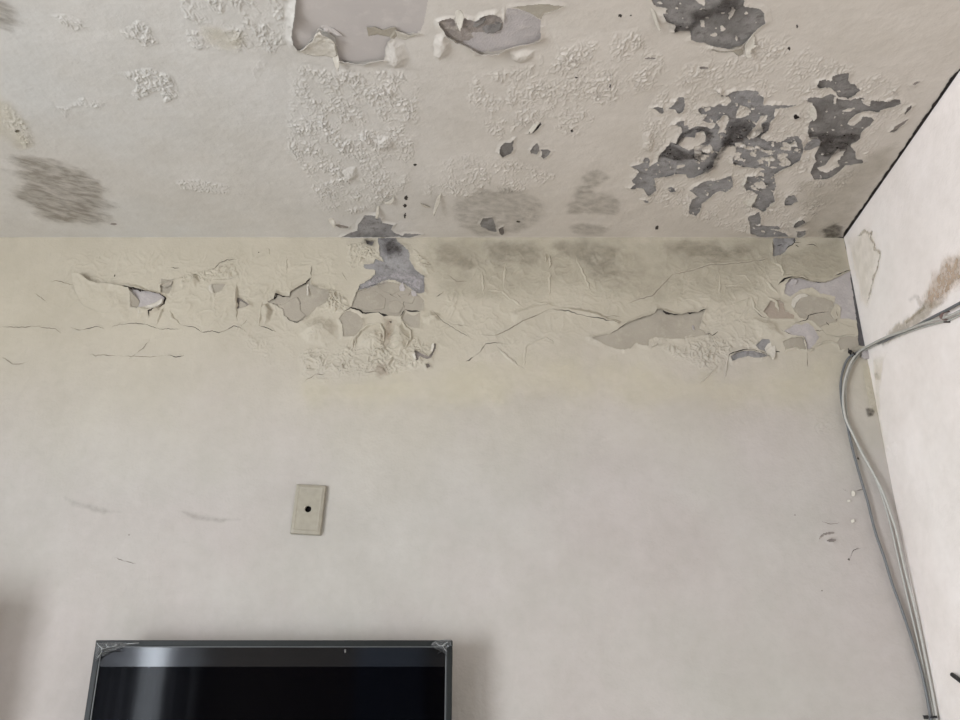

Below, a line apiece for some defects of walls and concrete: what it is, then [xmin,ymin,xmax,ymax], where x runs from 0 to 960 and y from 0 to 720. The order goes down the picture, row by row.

peeling [281,0,570,71]
spalling [645,0,773,70]
spalling [625,67,925,260]
peeling [72,272,178,313]
crack [1,266,312,357]
spalling [206,206,430,342]
peeling [410,340,440,372]
crack [344,263,838,365]
peeling [585,304,713,356]
peeling [726,266,865,366]